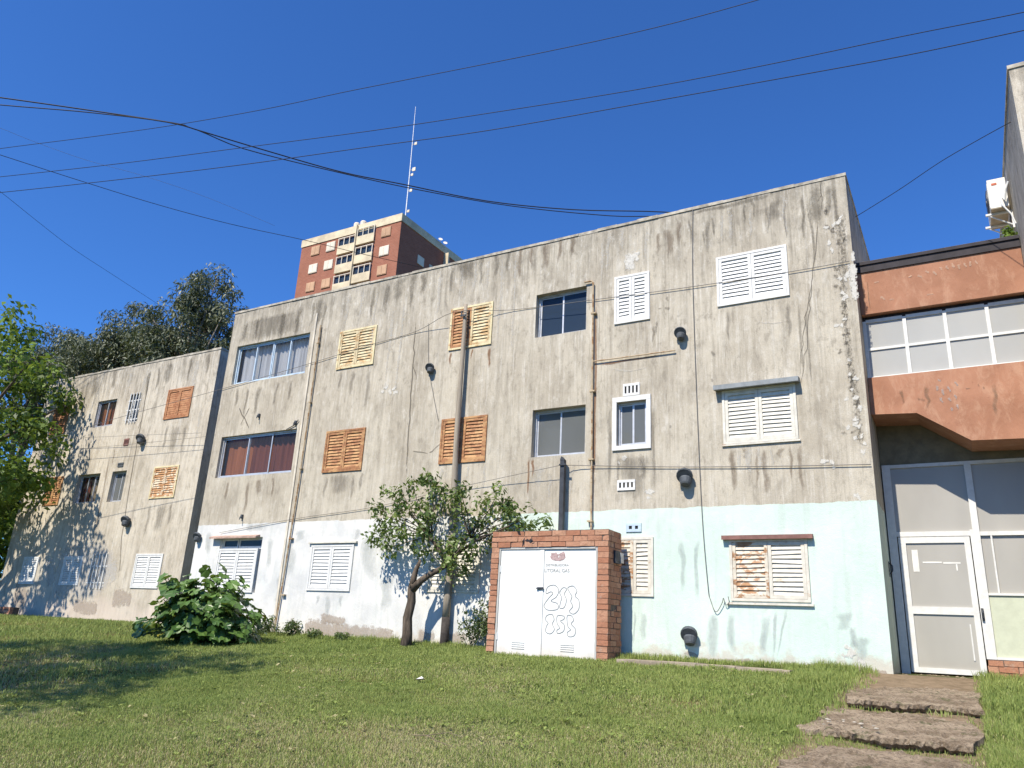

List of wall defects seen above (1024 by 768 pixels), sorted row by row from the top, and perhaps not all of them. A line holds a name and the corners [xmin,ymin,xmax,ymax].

crack [800,182,822,380]
peeling [837,251,859,301]
flaking render [844,358,867,455]